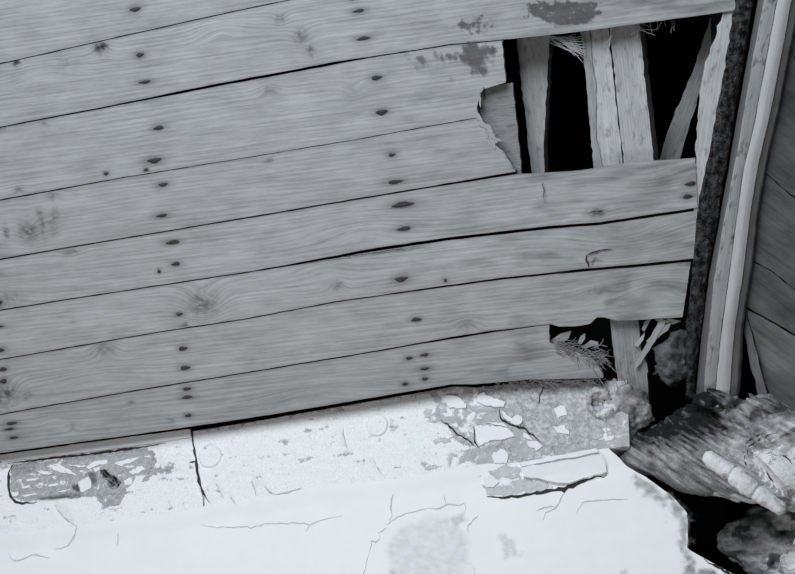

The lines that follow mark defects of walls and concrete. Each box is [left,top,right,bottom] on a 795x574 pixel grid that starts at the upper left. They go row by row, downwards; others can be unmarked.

peeling [433,378,621,496]
crack [363,494,478,574]
crack [487,475,623,519]